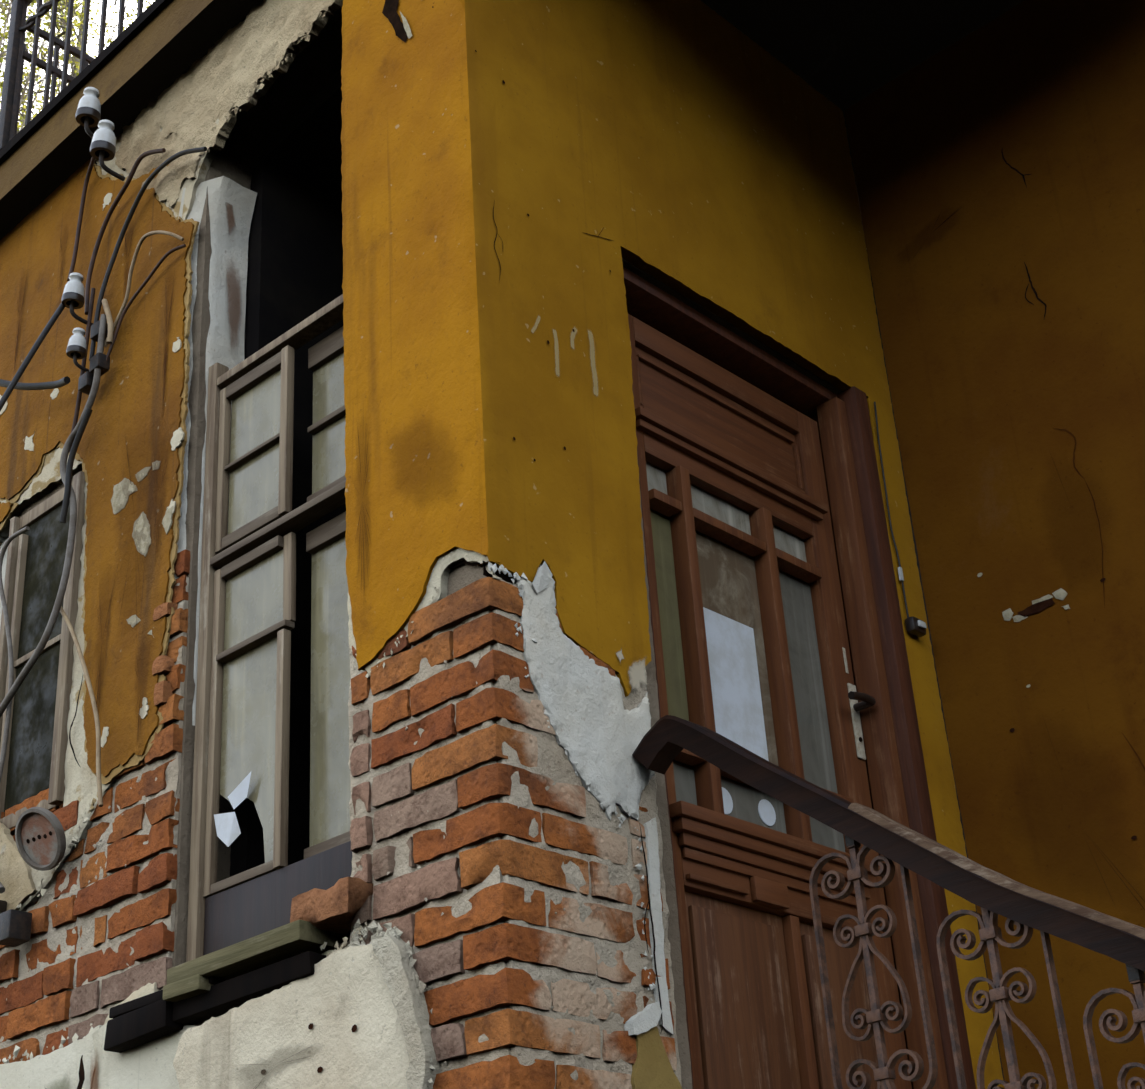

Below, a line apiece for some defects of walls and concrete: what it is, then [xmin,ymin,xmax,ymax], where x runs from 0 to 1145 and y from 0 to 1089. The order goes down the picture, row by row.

hole [382,0,413,42]
crack [493,200,503,280]
crack [1024,262,1047,318]
flaking render [0,0,343,1064]
crack [1053,428,1105,606]
peeling [1002,588,1070,622]
flaking render [320,552,682,1089]